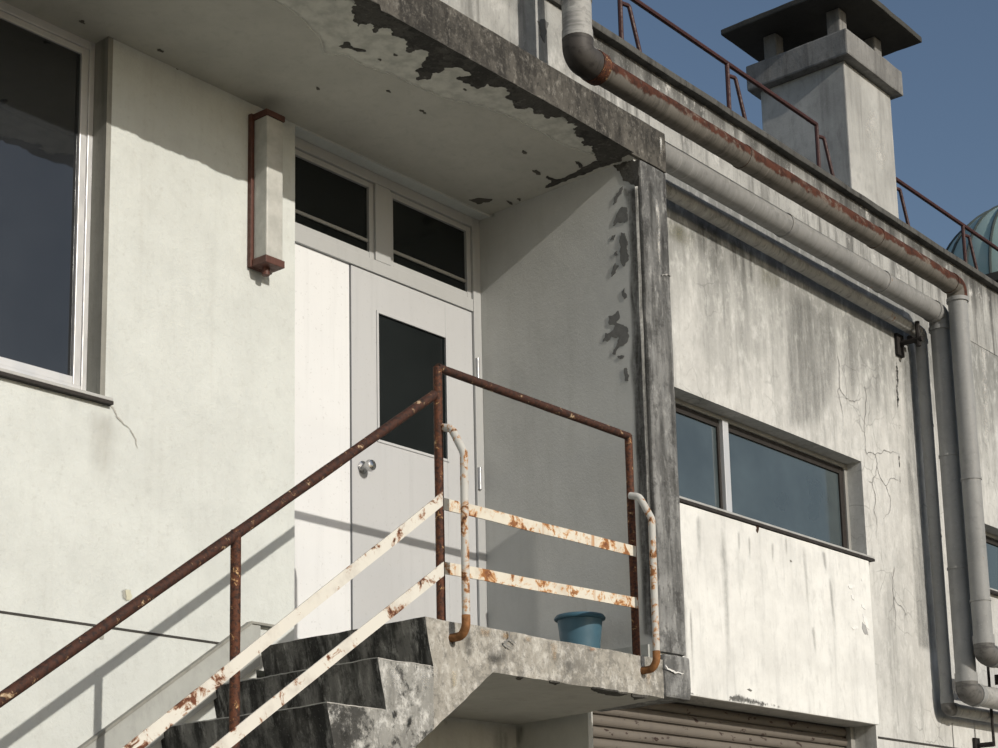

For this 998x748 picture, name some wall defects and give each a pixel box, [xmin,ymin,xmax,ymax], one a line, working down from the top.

peeling [339,42,366,52]
peeling [351,0,640,277]
peeling [603,311,629,381]
crack [111,405,138,449]
crack [838,359,900,518]